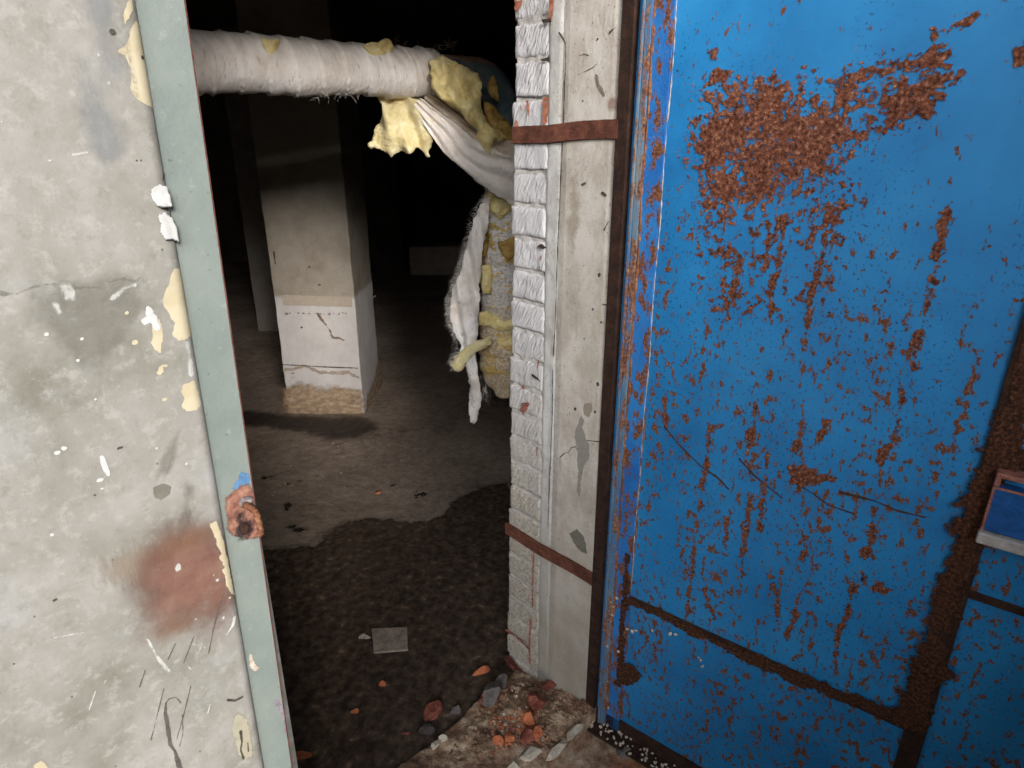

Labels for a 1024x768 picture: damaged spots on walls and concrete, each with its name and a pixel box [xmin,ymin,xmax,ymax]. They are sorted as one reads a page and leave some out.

peeling [109,0,153,109]
peeling [151,185,180,242]
peeling [141,268,201,411]
crack [282,362,358,370]
crack [317,314,344,341]
corrosion [605,1,1024,733]
corrosion [225,485,259,539]
corrosion [116,528,233,629]
peeling [210,521,235,599]